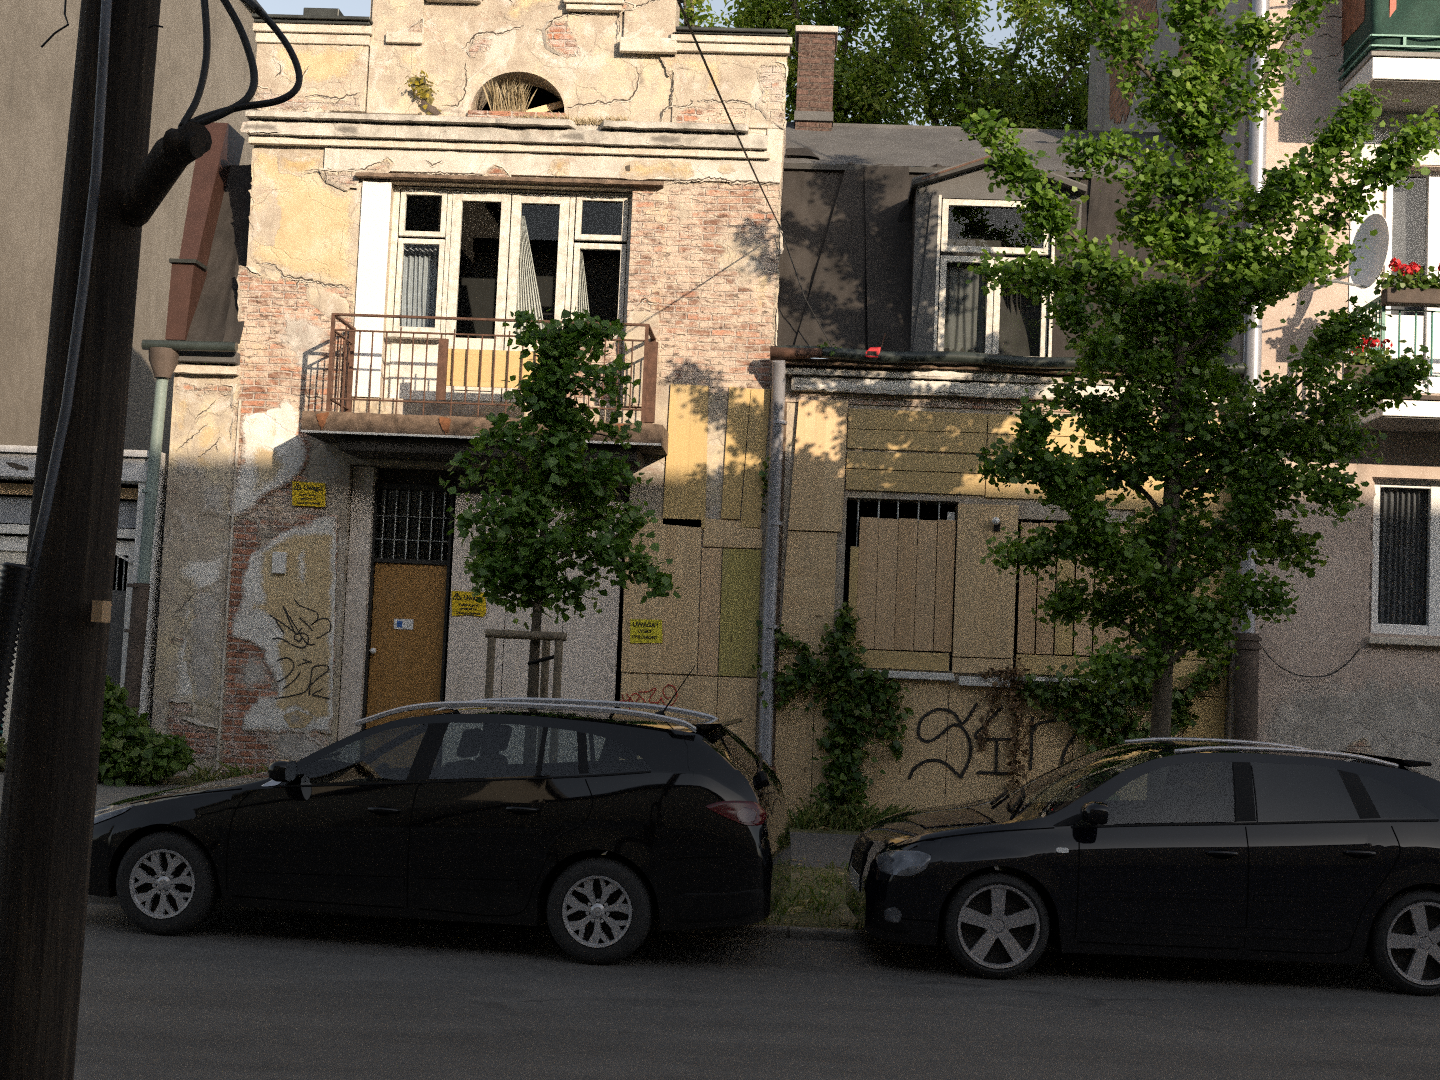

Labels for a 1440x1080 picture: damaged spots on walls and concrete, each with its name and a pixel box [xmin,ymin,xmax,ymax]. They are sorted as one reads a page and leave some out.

flaking render [504,0,592,69]
crack [442,0,656,108]
crack [565,71,756,122]
flaking render [619,160,784,407]
peeling [164,148,395,778]